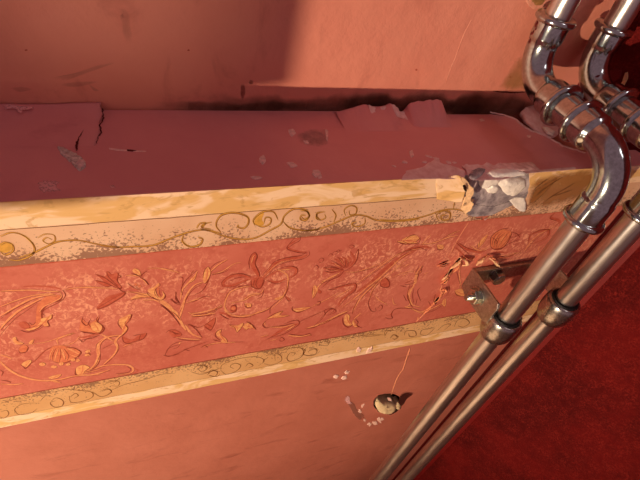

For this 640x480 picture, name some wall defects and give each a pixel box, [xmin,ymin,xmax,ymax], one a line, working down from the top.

peeling [0,102,104,171]
peeling [336,103,424,132]
spalling [519,105,558,139]
spalling [392,150,576,217]
spalling [358,392,404,427]